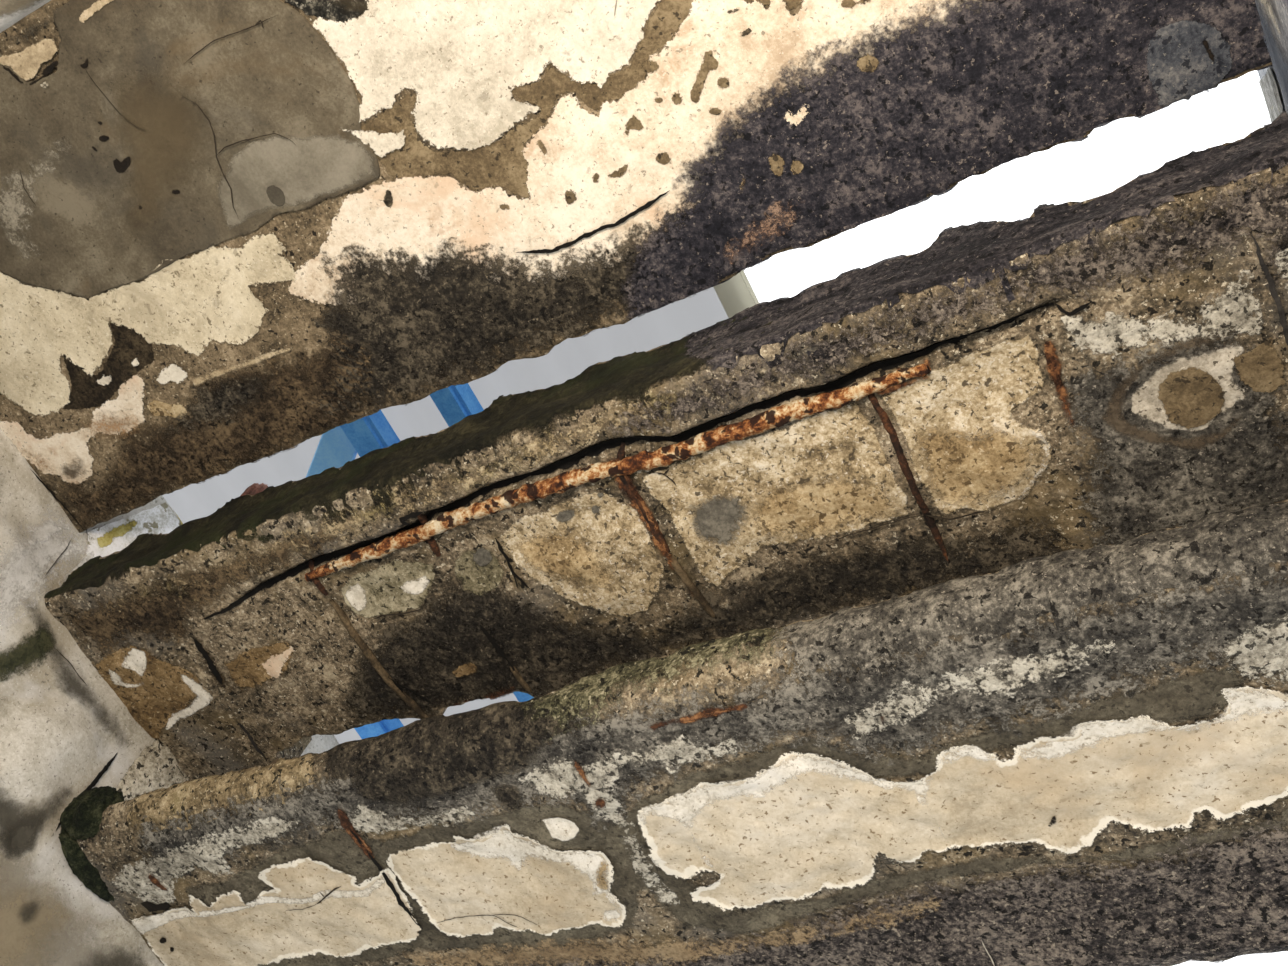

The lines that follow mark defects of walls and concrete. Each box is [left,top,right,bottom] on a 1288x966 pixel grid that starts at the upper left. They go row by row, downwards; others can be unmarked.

peeling [0,0,977,484]
crack [516,190,670,253]
water stain [0,0,1288,735]
rust [876,359,930,395]
peeling [1102,334,1286,449]
crack [193,301,1092,685]
rust [612,458,674,569]
peeling [305,334,1051,618]
peeling [95,645,213,801]
peeling [452,663,477,677]
rust [337,809,374,859]
peeling [131,669,1288,966]